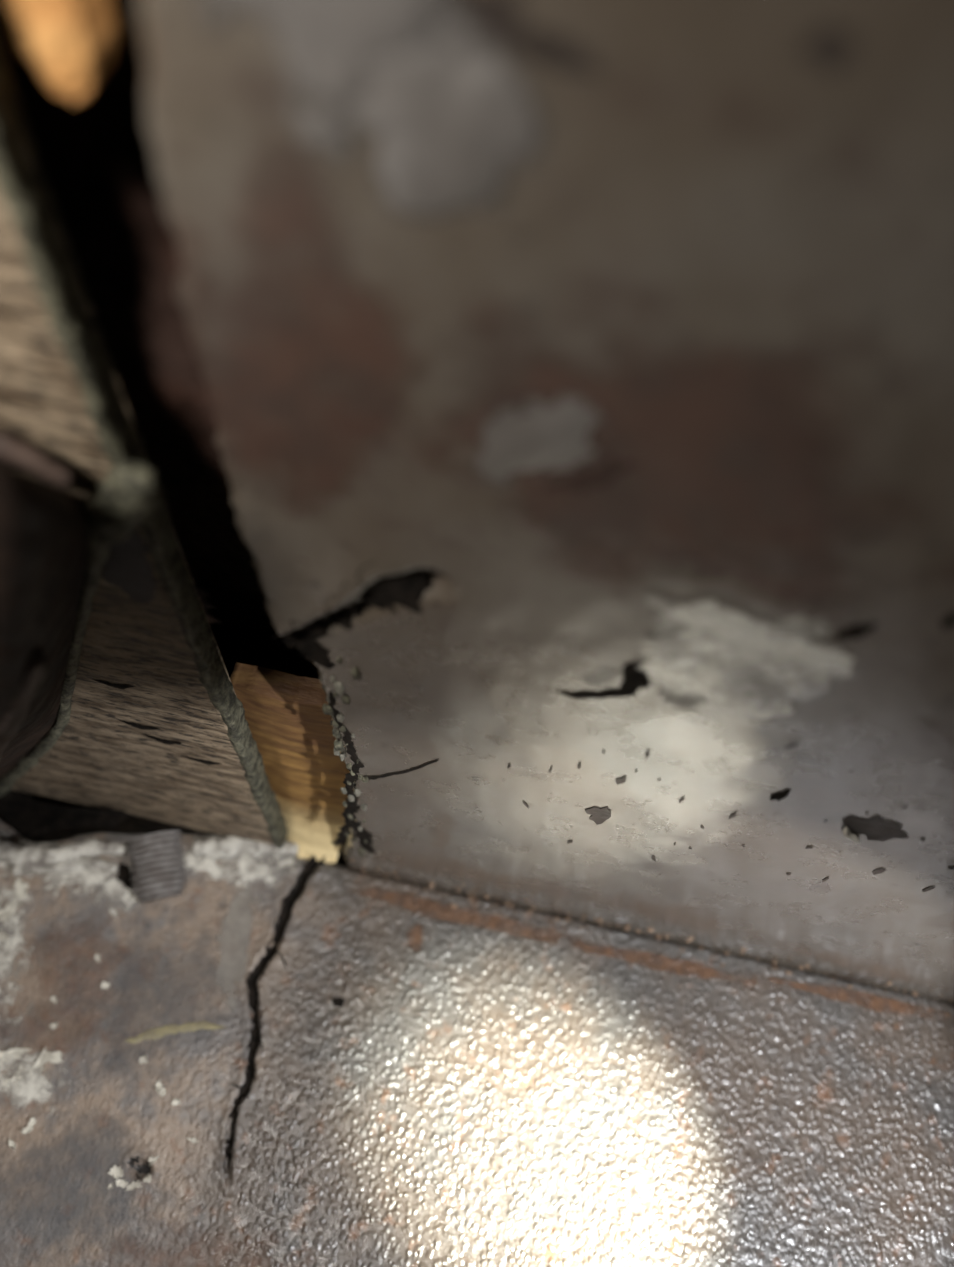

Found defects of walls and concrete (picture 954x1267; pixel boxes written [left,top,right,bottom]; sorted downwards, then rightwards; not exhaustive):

peeling [638,594,877,719]
peeling [770,790,791,801]
peeling [584,807,611,825]
peeling [841,816,908,844]
crack [224,561,438,1184]
rust [354,888,559,950]
rust [573,944,730,979]
rust [746,978,916,1014]